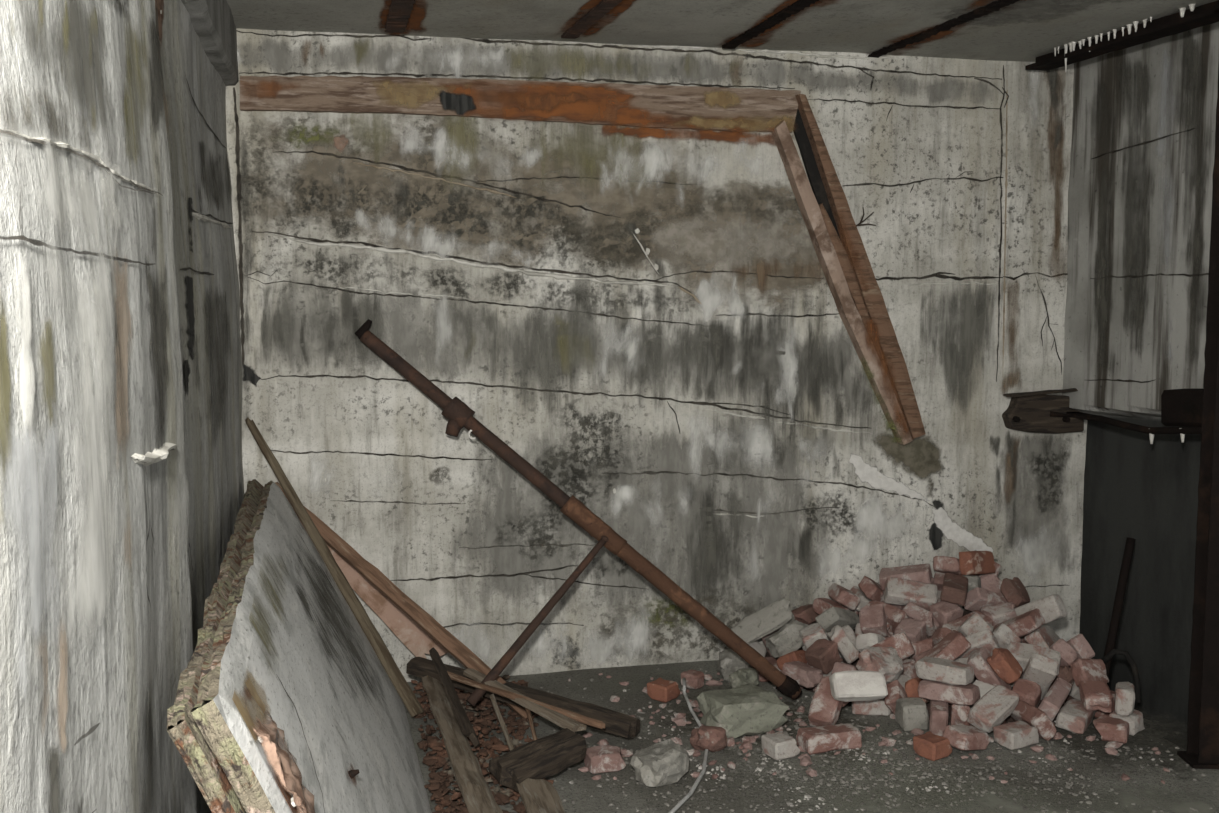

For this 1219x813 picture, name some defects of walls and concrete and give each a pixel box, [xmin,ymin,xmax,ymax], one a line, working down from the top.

corrosion [380,0,426,35]
corrosion [563,0,636,36]
crack [0,38,1208,434]
water stain [131,261,177,466]
water stain [614,259,865,468]
water stain [0,253,57,631]
water stain [43,241,131,813]
crack [271,450,492,460]
crack [390,544,645,589]
water stain [539,405,620,505]
crack [608,471,936,518]
flaking render [849,454,993,552]